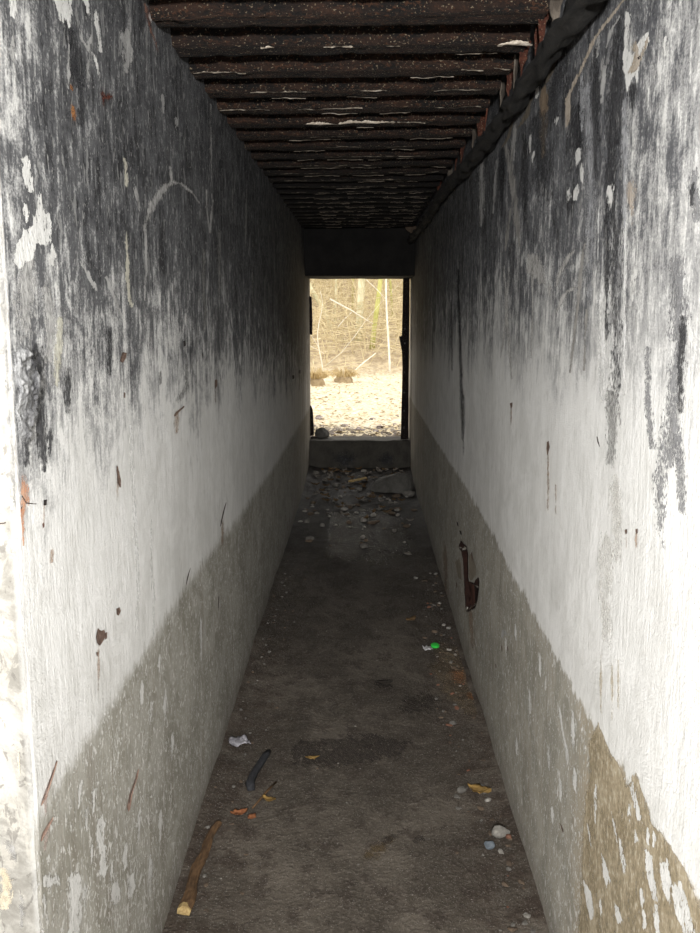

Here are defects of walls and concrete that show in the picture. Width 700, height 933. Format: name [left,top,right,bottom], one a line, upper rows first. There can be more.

corrosion [500,0,563,106]
spalling [596,11,650,104]
corrosion [438,107,489,190]
corrosion [535,85,549,158]
peeling [13,155,63,386]
leakage [564,46,638,468]
leakage [63,367,73,413]
leakage [106,327,114,375]
leakage [644,346,656,449]
leakage [677,316,687,414]
corrosion [19,479,30,546]
leakage [671,434,687,515]